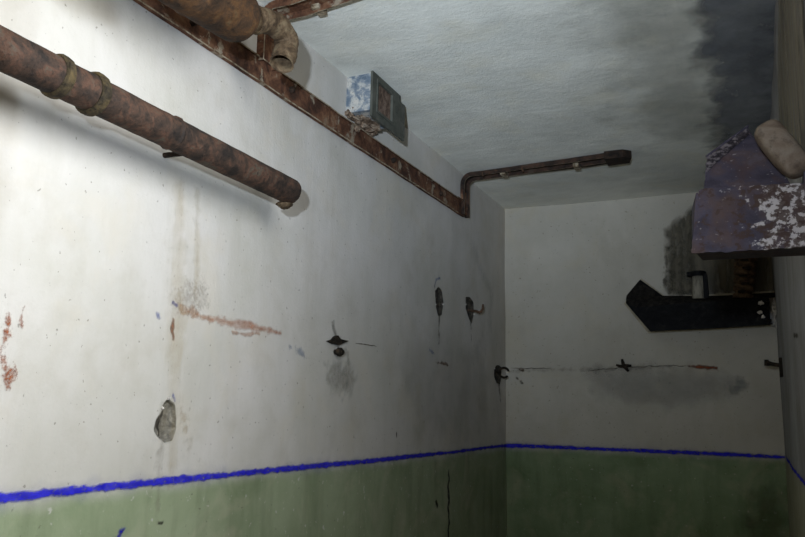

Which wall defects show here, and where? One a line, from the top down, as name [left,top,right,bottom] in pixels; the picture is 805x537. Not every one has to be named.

flaking render [154,397,176,442]
crack [444,471,452,537]